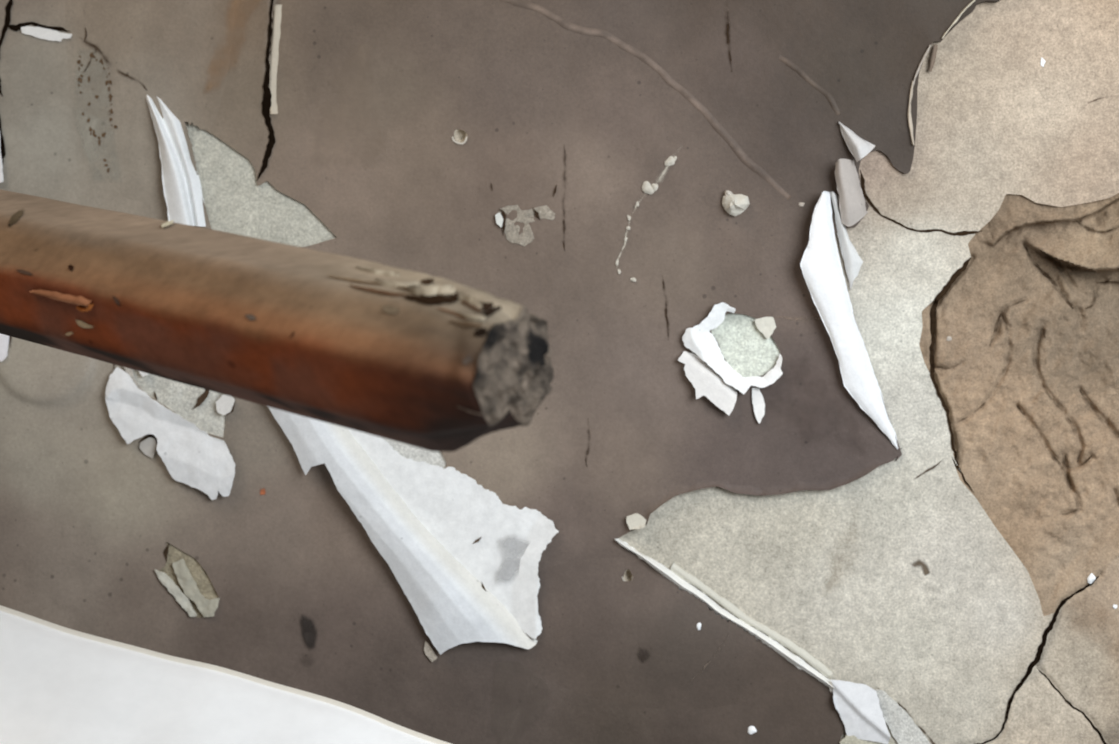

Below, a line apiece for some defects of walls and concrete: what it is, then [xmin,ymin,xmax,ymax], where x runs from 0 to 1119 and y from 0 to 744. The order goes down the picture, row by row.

crack [0,79,8,164]
crack [0,0,147,90]
peeling [146,95,337,247]
crack [257,0,282,180]
spalling [495,185,557,246]
peeling [0,334,12,362]
peeling [105,364,236,500]
peeling [614,0,1119,744]
peeling [155,542,220,618]
peeling [269,407,559,662]
crack [977,574,1107,744]